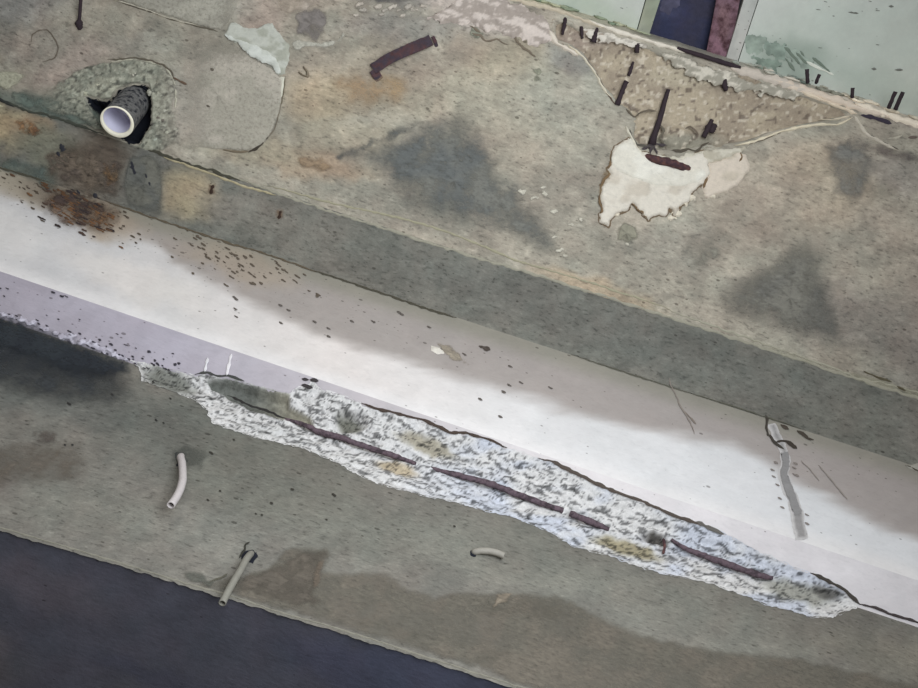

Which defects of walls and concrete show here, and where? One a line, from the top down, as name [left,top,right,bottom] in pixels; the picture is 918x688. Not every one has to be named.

spalling [427,0,918,228]
crack [0,167,48,182]
rust [38,144,151,237]
leakage [377,122,557,239]
crack [104,200,457,318]
leakage [0,312,128,398]
spalling [67,330,861,618]
crack [571,354,847,541]
crack [861,604,918,623]